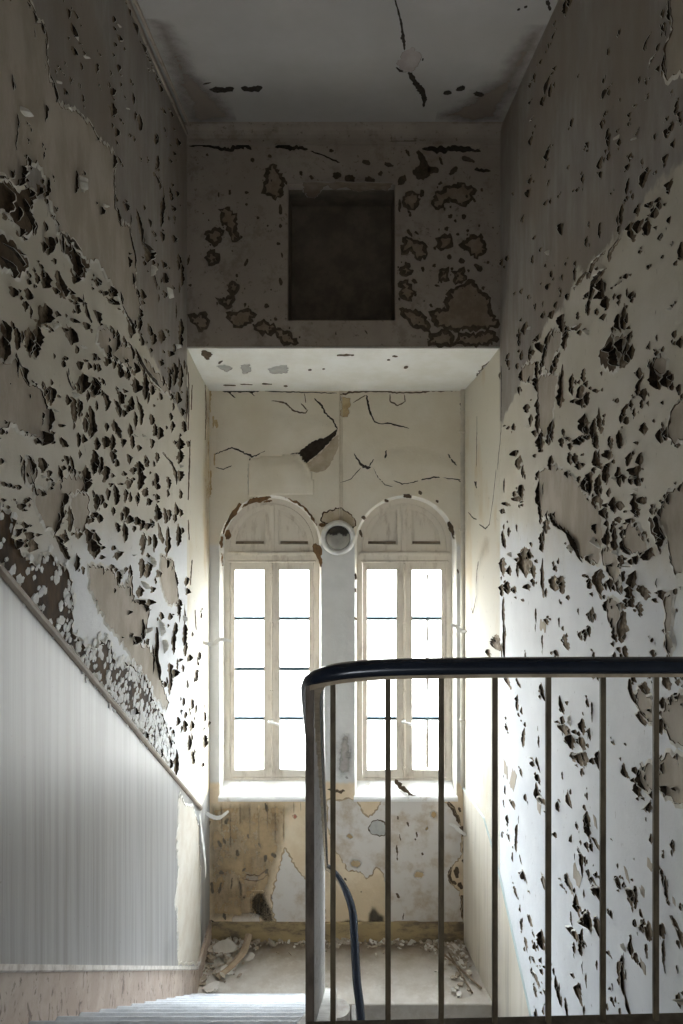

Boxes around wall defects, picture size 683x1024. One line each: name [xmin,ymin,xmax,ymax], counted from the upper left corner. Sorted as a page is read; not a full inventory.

crack [395,0,427,107]
peeling [443,85,484,97]
peeling [332,149,509,348]
peeling [0,0,300,775]
crack [215,447,265,470]
flaking render [219,396,366,567]
crack [223,391,461,429]
peeling [485,0,683,657]
damp [209,803,301,922]
peeling [326,797,463,922]
peeling [501,677,683,1016]